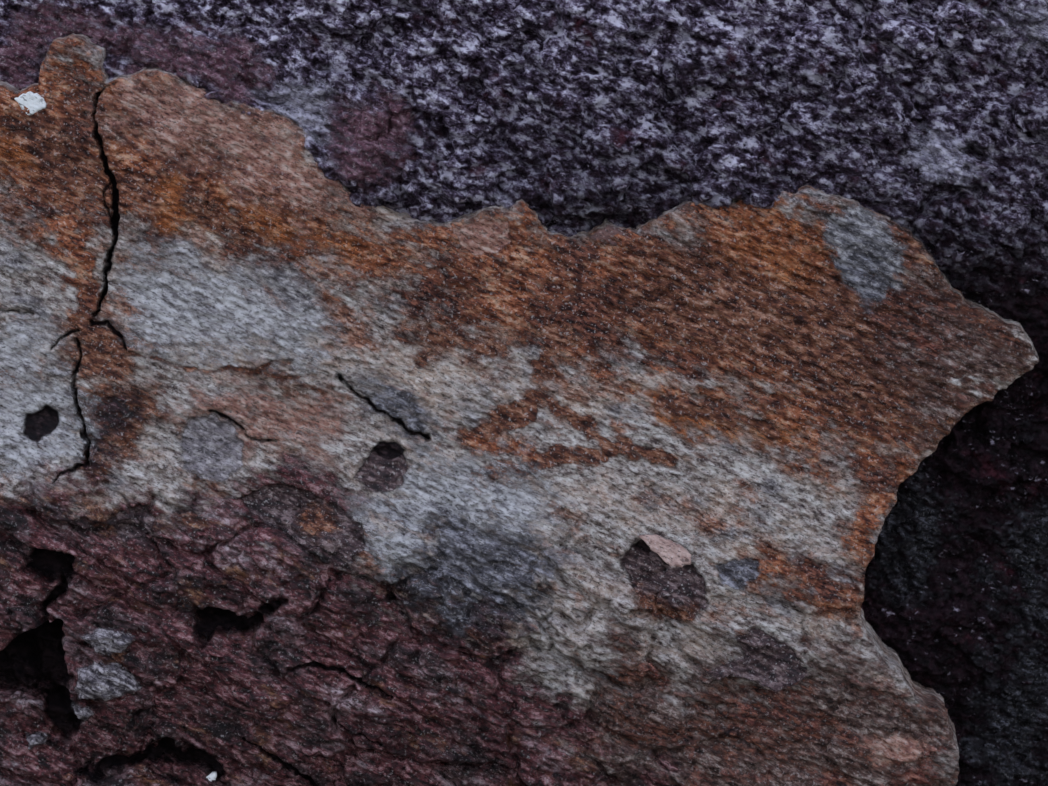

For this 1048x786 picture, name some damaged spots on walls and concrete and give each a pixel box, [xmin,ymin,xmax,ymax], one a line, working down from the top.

peeling [14,91,47,115]
crack [51,85,127,482]
rust [0,37,1034,620]
spalling [23,406,59,442]
spalling [181,414,244,481]
spalling [355,441,408,492]
crack [351,387,430,439]
spalling [241,484,366,560]
spalling [621,534,708,623]
peeling [704,628,807,692]
rust [583,620,960,786]
peeling [876,735,925,761]